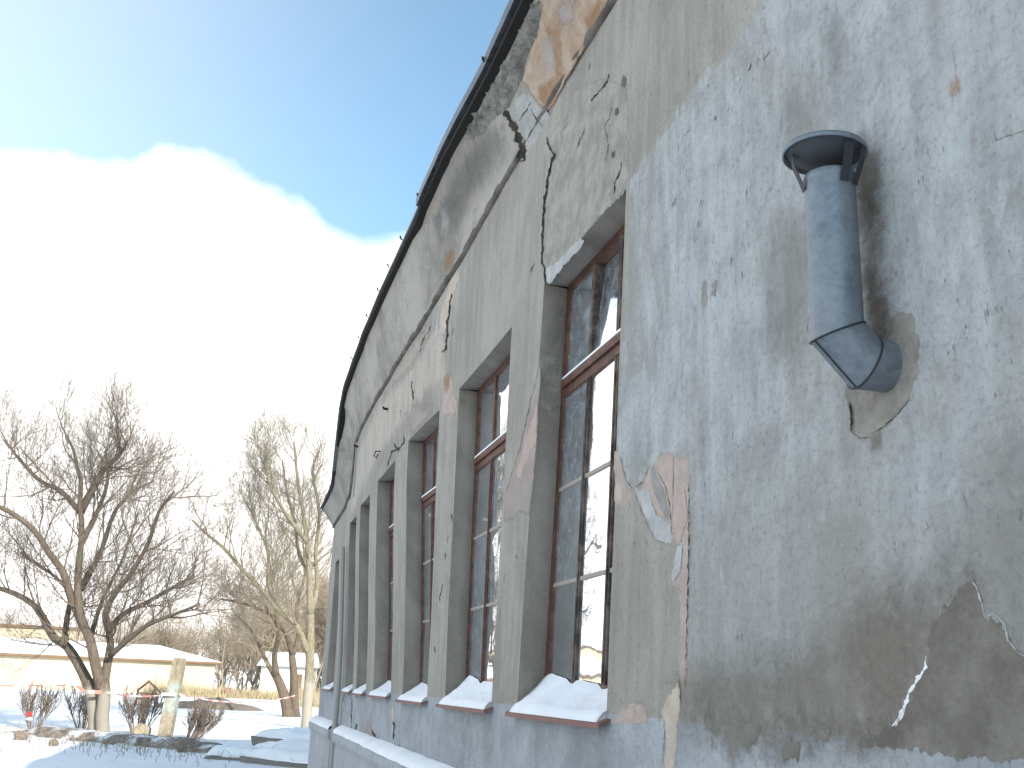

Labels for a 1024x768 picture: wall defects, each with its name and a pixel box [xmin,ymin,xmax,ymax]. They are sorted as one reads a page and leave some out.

crack [503,110,527,162]
flaking render [465,0,630,284]
crack [387,436,405,466]
flaking render [504,312,566,520]
flaking render [845,311,920,448]
flaking render [611,450,690,768]
flaking render [713,579,1024,763]